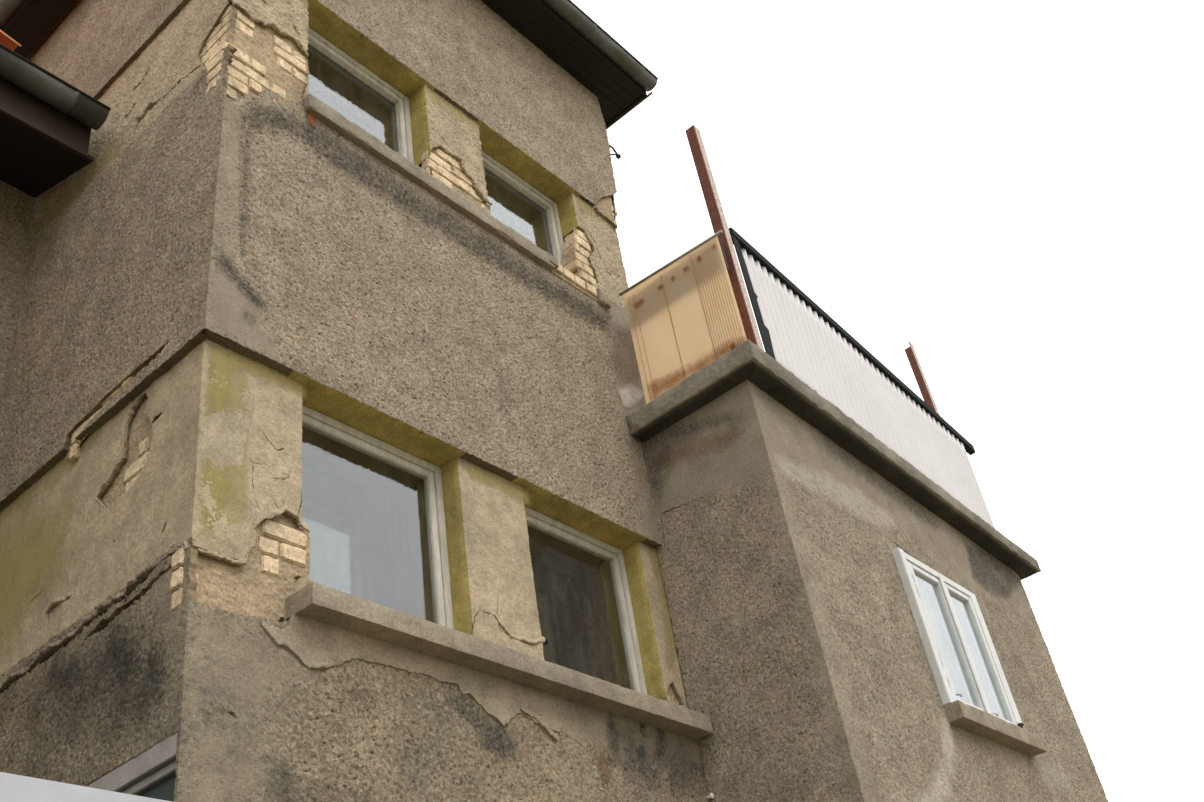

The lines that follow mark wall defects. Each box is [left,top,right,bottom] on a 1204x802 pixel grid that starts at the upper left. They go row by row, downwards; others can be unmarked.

flaking render [201,5,309,102]
flaking render [421,144,493,211]
leakage [251,107,604,329]
flaking render [548,225,597,302]
flaking render [170,342,568,733]
crack [471,605,549,645]
crack [520,705,559,742]